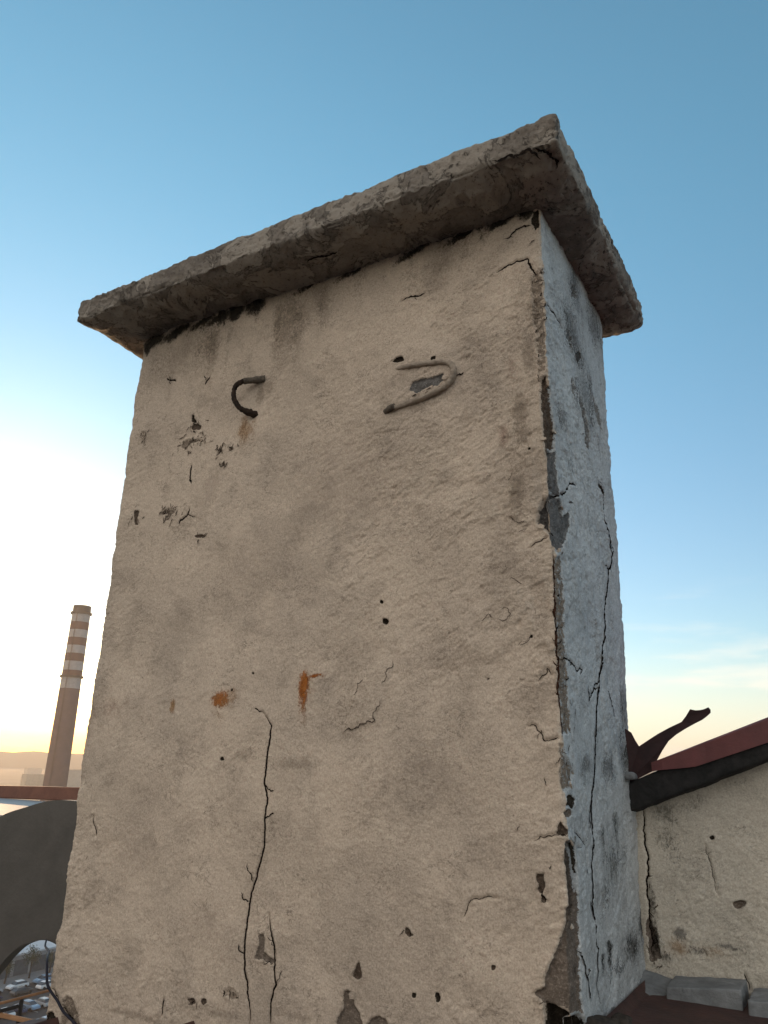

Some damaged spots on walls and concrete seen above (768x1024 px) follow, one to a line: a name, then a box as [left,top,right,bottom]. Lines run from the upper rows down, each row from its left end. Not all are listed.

crack [498,225,536,275]
damp [143,298,266,356]
spalling [409,373,463,397]
spalling [528,268,590,1024]
rust [212,691,229,707]
rust [298,670,320,716]
crack [518,480,614,999]
crack [238,708,282,1022]
crack [643,811,654,954]
spalling [255,935,274,964]
spalling [336,990,387,1024]